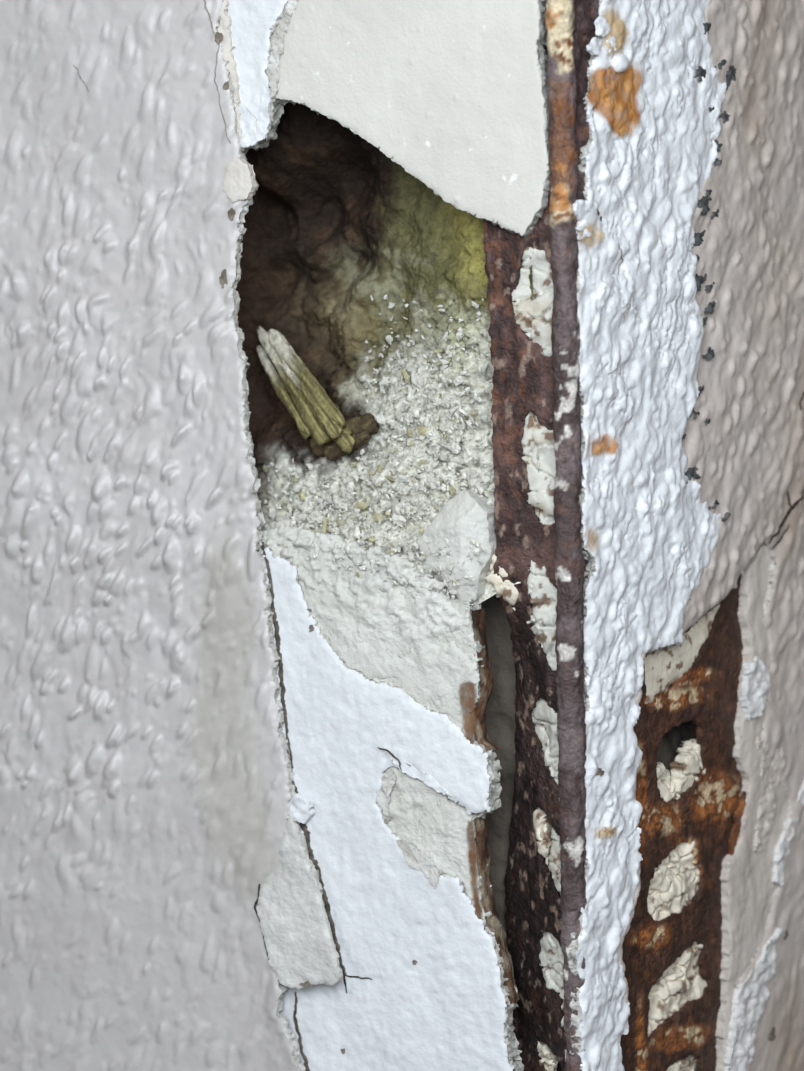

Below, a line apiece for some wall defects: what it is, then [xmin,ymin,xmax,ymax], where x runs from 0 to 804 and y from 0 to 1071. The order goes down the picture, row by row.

rust [587,66,642,136]
rust [603,11,628,53]
spalling [214,0,551,723]
crack [262,542,298,794]
rust [460,608,499,752]
crack [254,884,268,957]
peeling [256,792,343,989]
crack [299,822,373,993]
peeling [375,747,483,919]
rust [467,816,520,1004]
peeling [715,546,804,1071]
crack [282,985,310,1071]